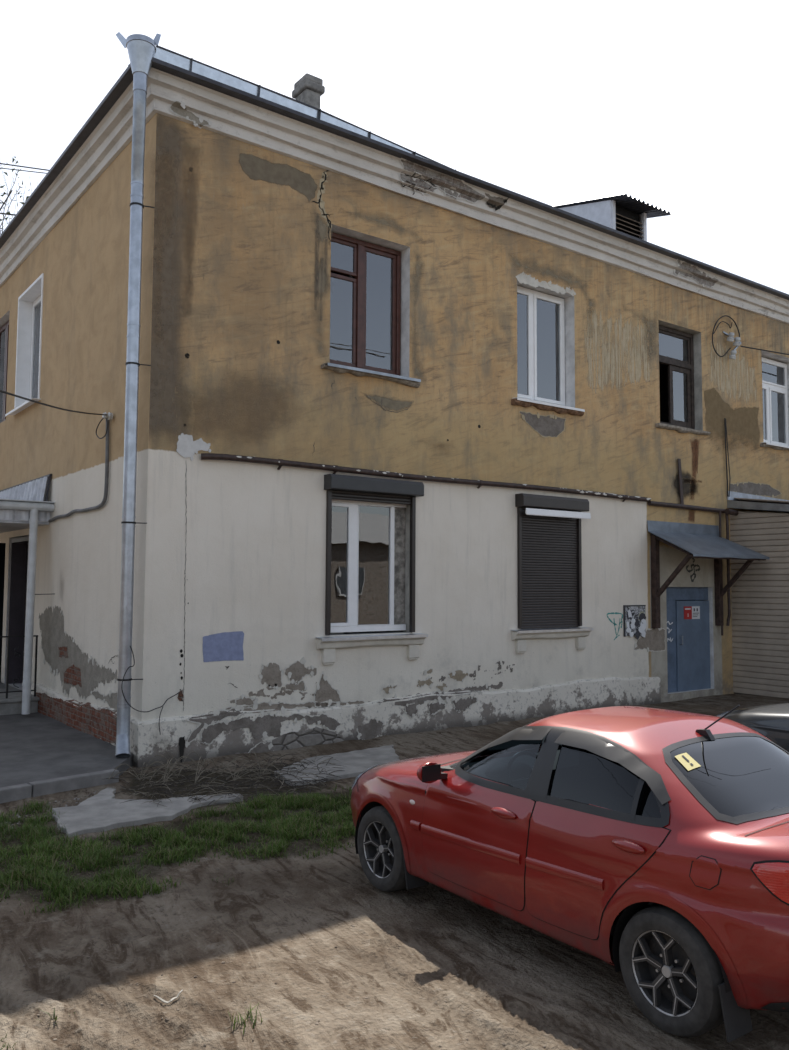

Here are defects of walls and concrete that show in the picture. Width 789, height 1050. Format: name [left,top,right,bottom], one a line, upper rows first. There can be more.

peeling [169,99,212,129]
water stain [239,154,317,201]
crack [312,170,332,245]
water stain [149,120,189,434]
water stain [704,342,760,445]
peeling [36,605,118,744]
peeling [179,657,515,763]